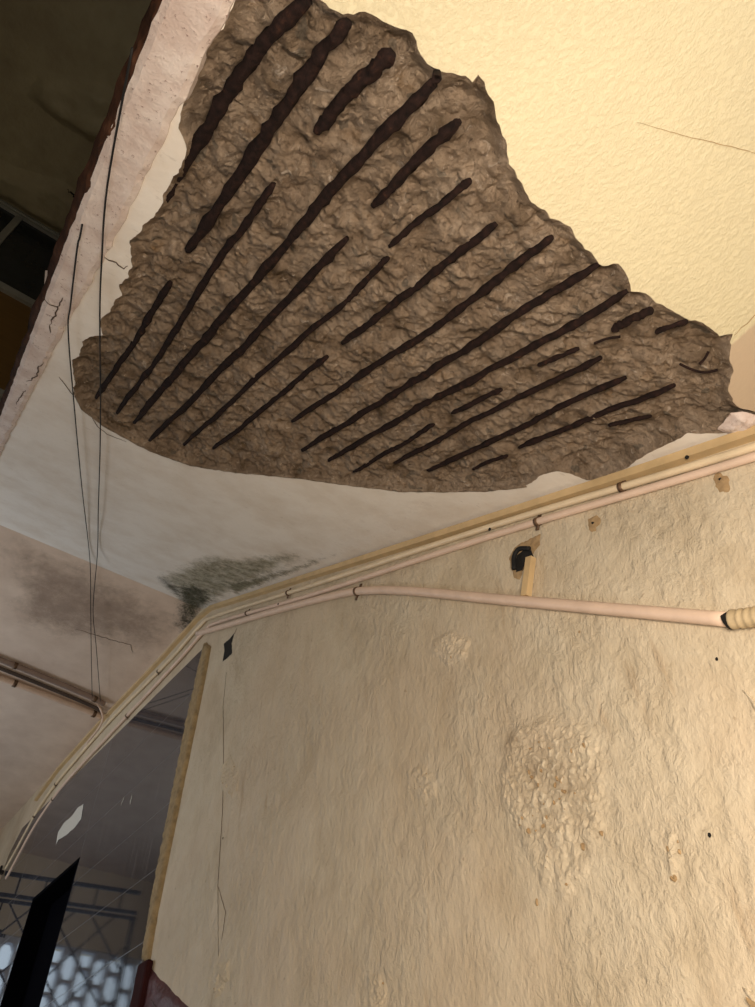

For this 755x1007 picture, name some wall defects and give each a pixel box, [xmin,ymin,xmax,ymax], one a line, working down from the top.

peeling [0,0,162,416]
spalling [72,0,755,493]
crack [637,122,753,153]
mould [167,557,290,625]
peeling [499,715,615,906]